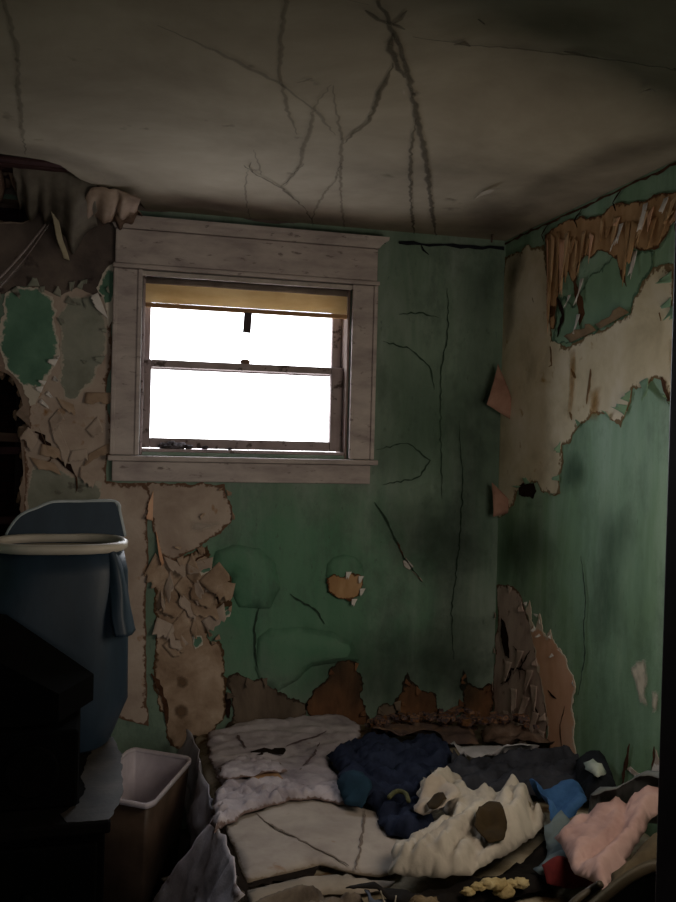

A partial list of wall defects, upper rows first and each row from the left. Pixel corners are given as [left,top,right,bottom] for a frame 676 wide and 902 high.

peeling [0,260,236,749]
crack [374,294,463,660]
peeling [492,584,577,754]
peeling [496,244,674,518]